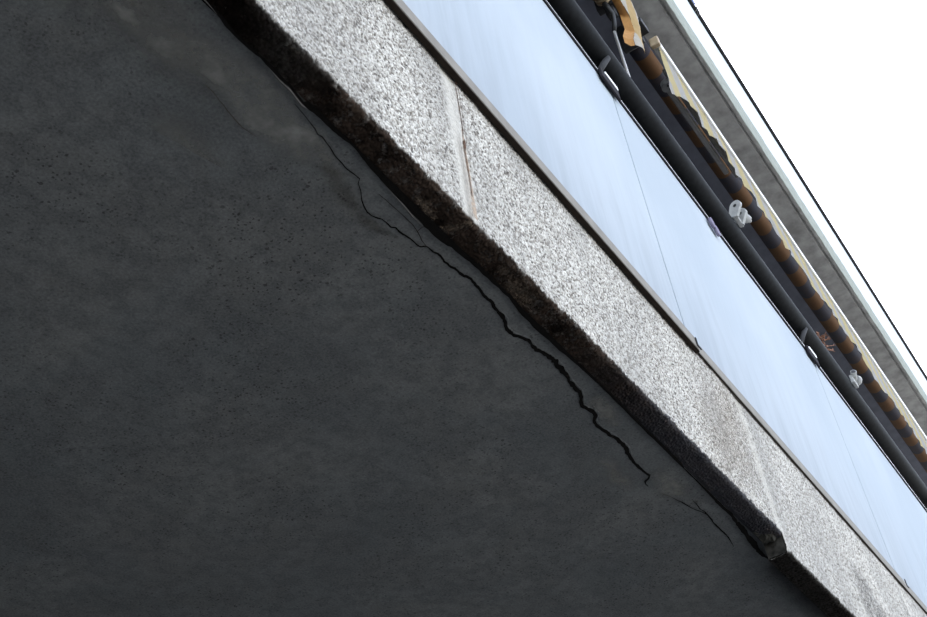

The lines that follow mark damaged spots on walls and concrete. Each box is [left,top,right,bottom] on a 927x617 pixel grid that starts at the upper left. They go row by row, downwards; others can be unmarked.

crack [204,0,768,559]